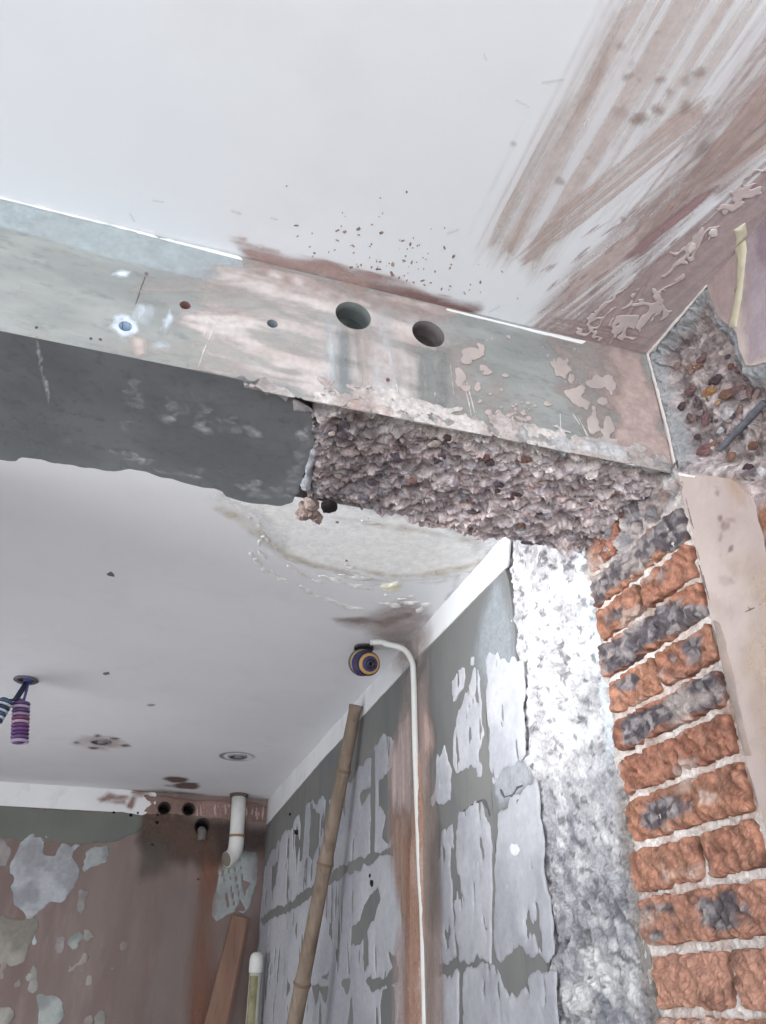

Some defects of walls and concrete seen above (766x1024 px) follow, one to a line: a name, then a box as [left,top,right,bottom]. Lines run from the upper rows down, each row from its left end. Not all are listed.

corrosion [237,238,476,313]
flaking render [212,168,766,1024]
damp [140,814,230,904]
damp [244,831,266,851]
flaking render [0,834,110,1024]
damp [191,936,211,1024]